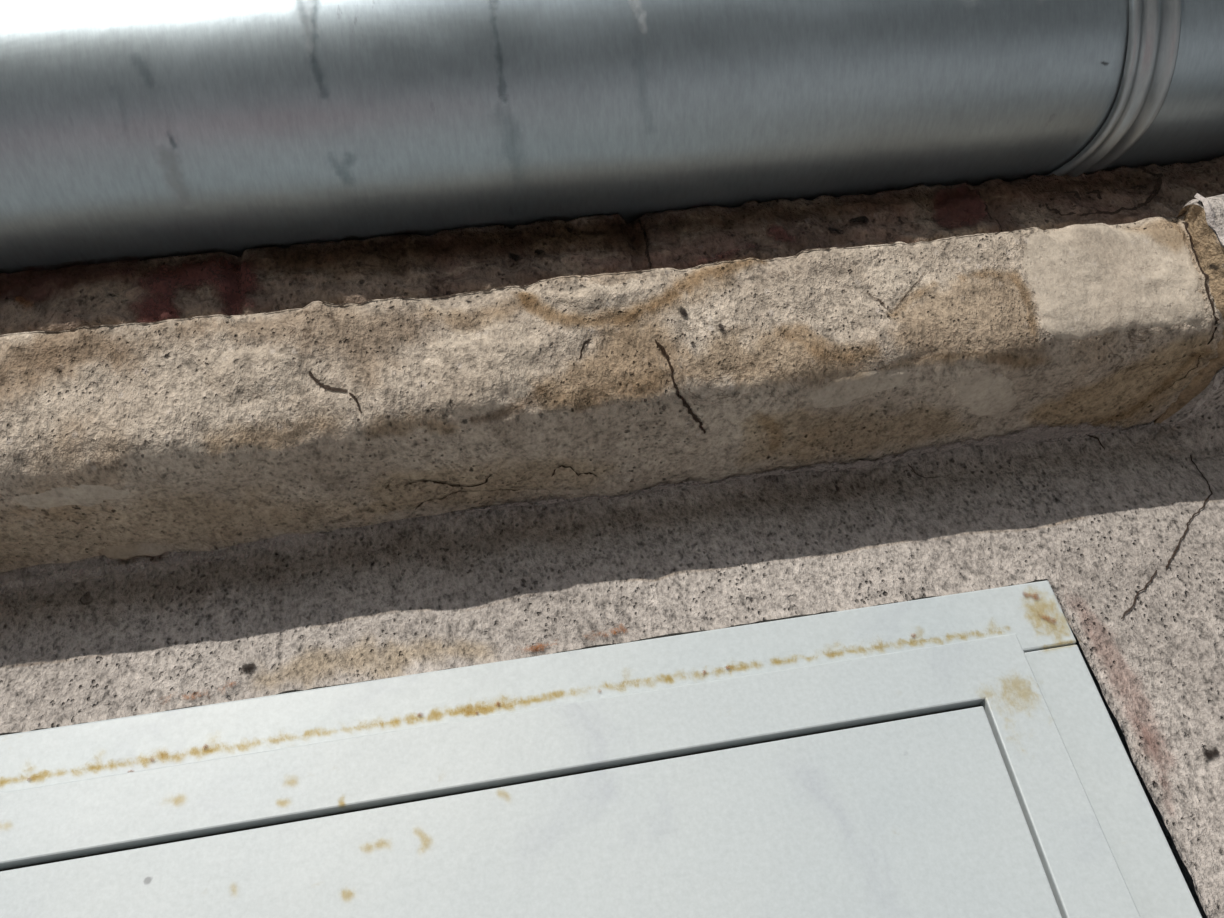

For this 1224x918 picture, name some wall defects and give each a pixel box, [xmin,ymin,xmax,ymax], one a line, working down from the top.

crack [309,371,362,413]
crack [655,339,706,434]
crack [1167,222,1219,389]
crack [1121,455,1213,619]